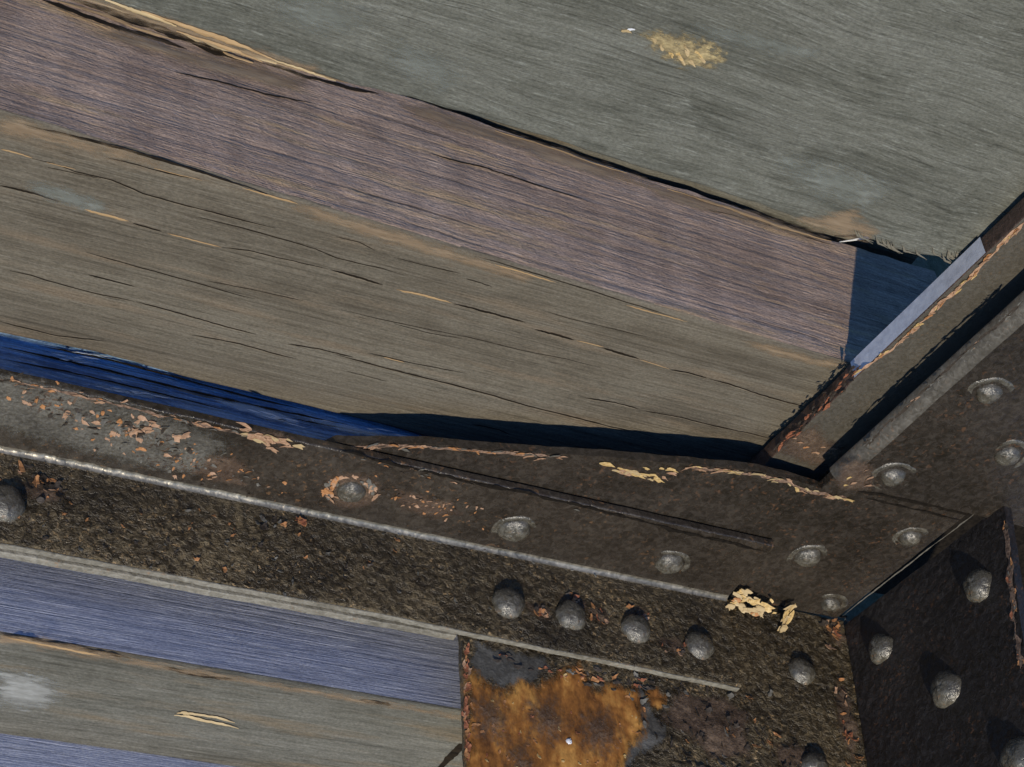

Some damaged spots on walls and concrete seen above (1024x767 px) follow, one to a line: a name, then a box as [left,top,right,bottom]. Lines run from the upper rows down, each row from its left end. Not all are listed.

crack [43,0,379,103]
crack [0,124,804,407]
corrosion [802,210,878,238]
crack [0,252,766,443]
peeling [0,372,305,497]
peeling [321,462,484,522]
peeling [353,443,568,461]
peeling [599,462,854,502]
corrosion [773,365,874,489]
peeling [725,588,797,633]
corrosion [1003,521,1024,669]
corrosion [461,642,809,767]